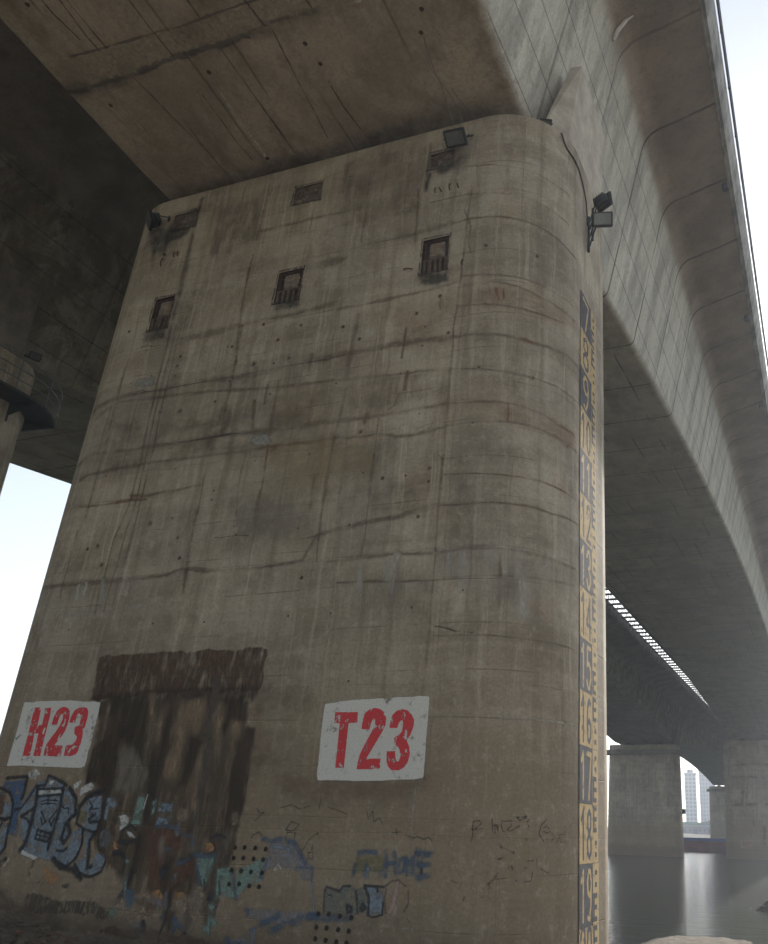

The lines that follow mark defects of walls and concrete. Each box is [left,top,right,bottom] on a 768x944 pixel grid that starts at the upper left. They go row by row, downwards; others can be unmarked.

leakage [60,0,317,95]